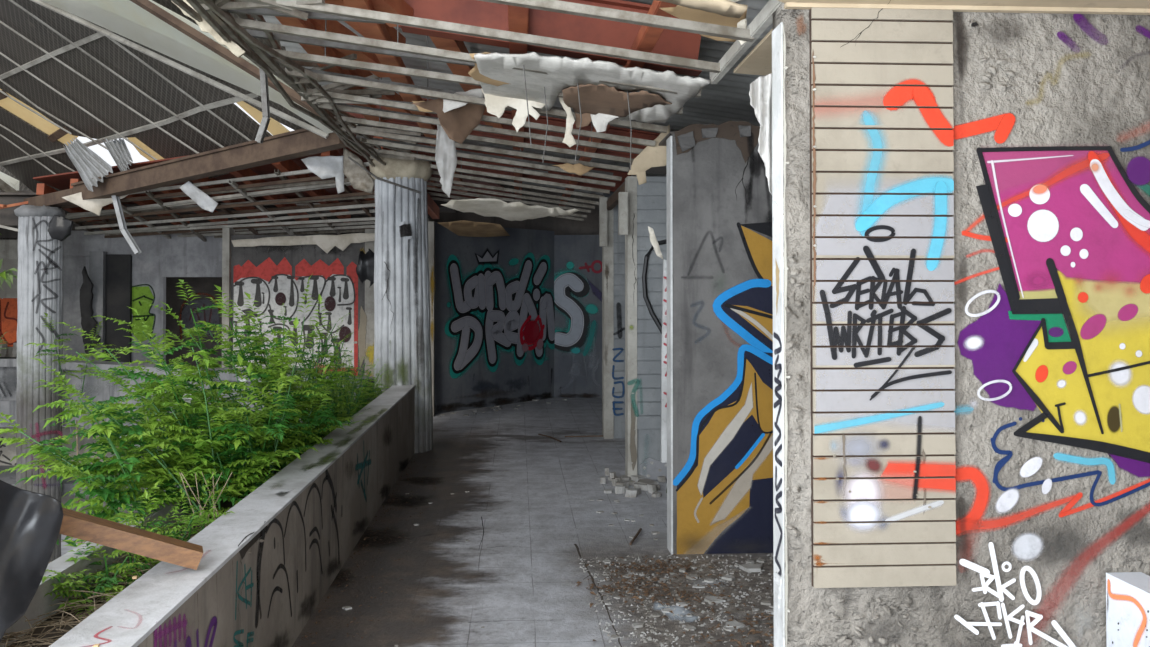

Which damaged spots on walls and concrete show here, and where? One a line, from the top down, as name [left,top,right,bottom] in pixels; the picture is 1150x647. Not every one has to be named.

spalling [674,120,760,163]
crack [574,544,622,647]